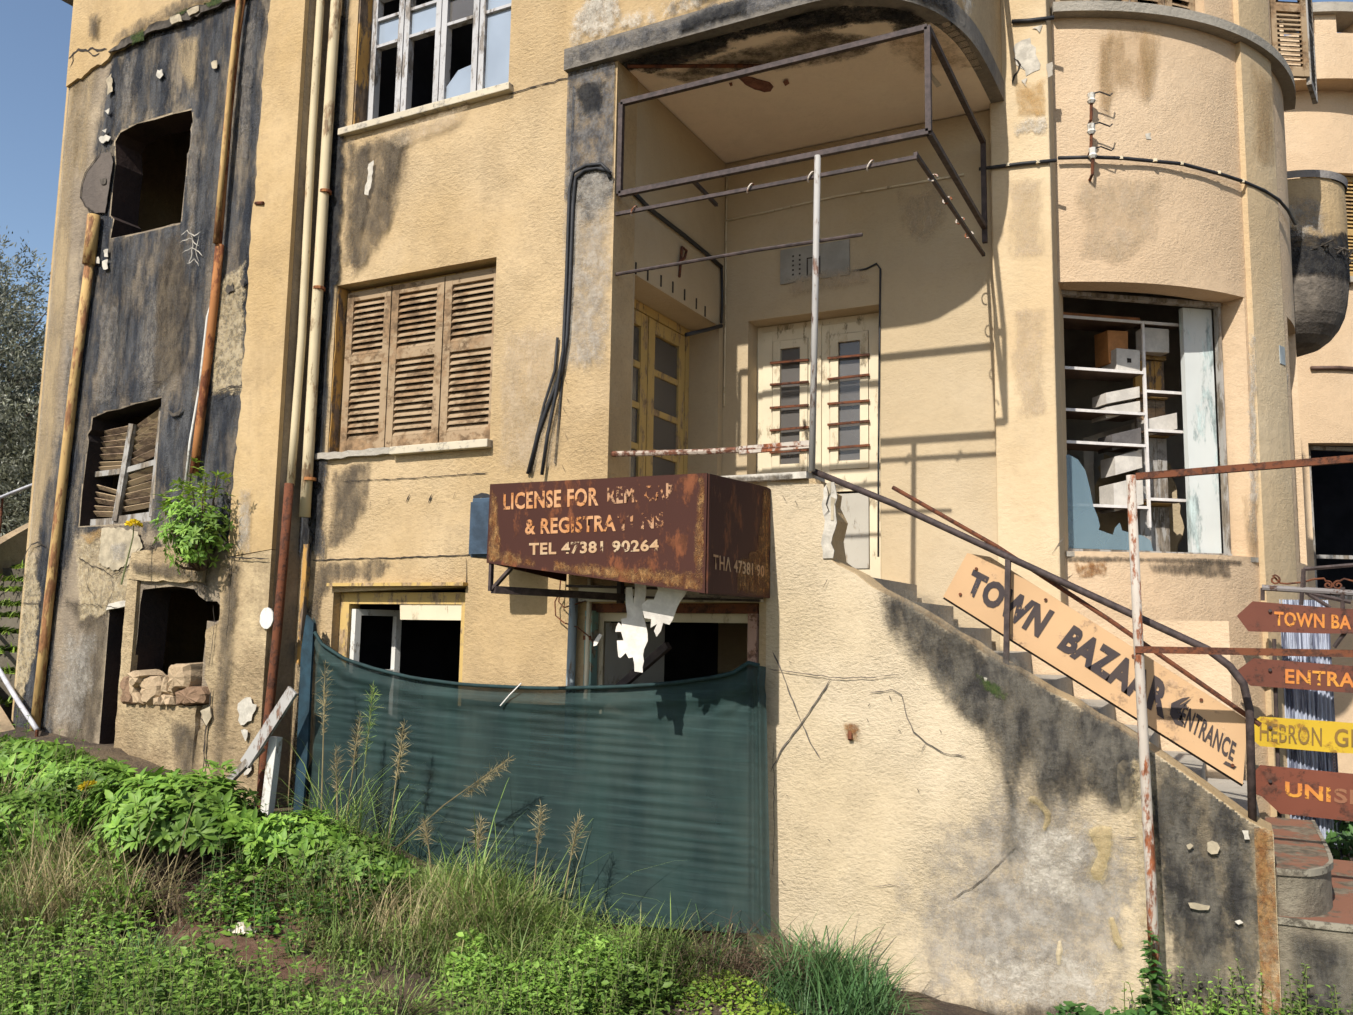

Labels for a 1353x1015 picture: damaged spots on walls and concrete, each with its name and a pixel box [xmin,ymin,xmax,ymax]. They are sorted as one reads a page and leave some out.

spalling [108,0,233,53]
damp [564,0,929,363]
damp [1289,201,1351,287]
damp [298,0,407,632]
flaking render [99,527,143,571]
damp [287,665,300,805]
corrosion [845,724,858,741]
crack [771,669,964,757]
damp [885,590,1259,1015]